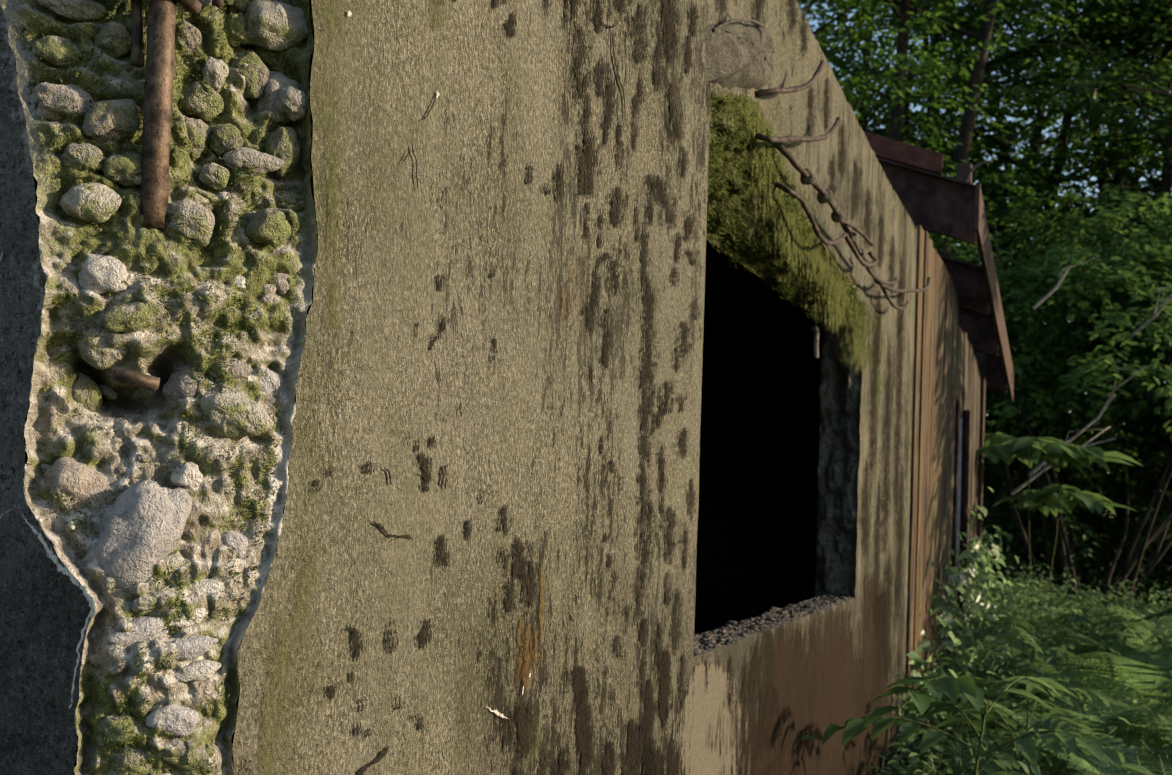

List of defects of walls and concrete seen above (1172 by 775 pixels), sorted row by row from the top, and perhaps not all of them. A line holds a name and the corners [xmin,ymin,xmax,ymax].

leakage [412,317,447,351]
spalling [0,0,318,775]
leakage [364,460,392,485]
leakage [406,436,453,493]
leakage [435,532,450,569]
crack [0,509,96,709]
leakage [344,624,367,682]
leakage [417,618,435,649]
rust [517,569,545,692]
leakage [354,698,372,737]
leakage [391,694,426,730]